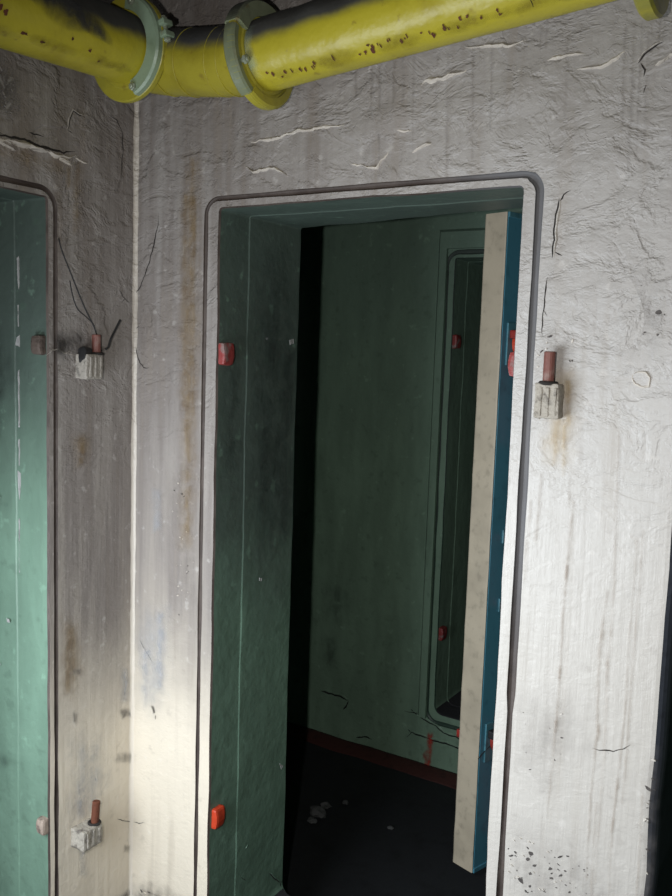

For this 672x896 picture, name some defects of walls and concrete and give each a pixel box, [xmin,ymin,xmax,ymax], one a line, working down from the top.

crack [552,190,571,257]
crack [540,280,548,332]
crack [406,709,459,749]